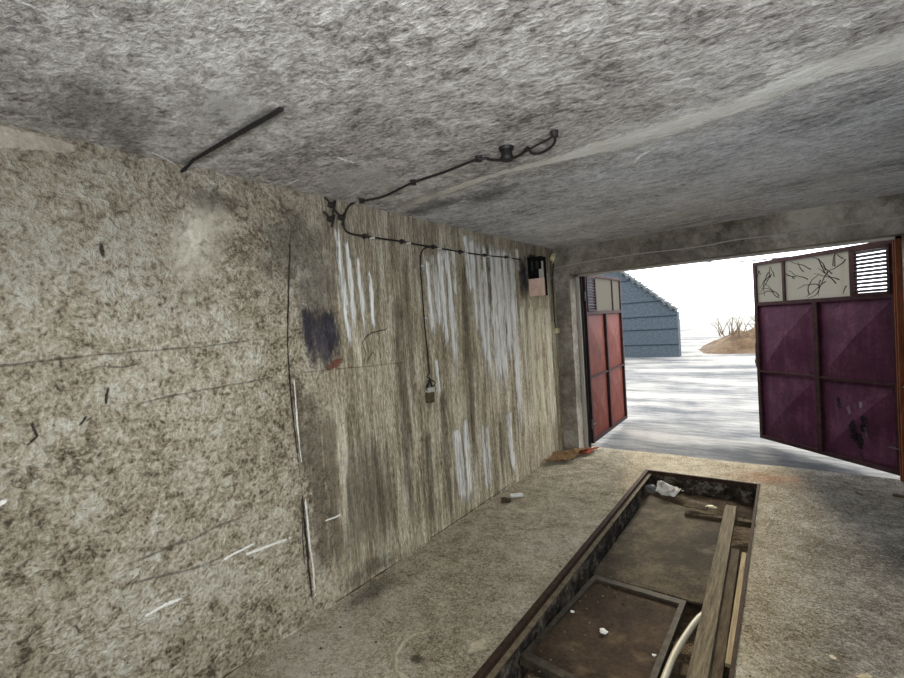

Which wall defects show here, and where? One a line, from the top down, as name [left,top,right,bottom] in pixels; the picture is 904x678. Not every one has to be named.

damp [334,229,375,341]
crack [0,348,180,404]
crack [287,234,302,471]
crack [321,327,388,371]
damp [396,263,413,504]
damp [424,235,557,516]
crack [301,498,402,602]
crack [433,481,515,537]